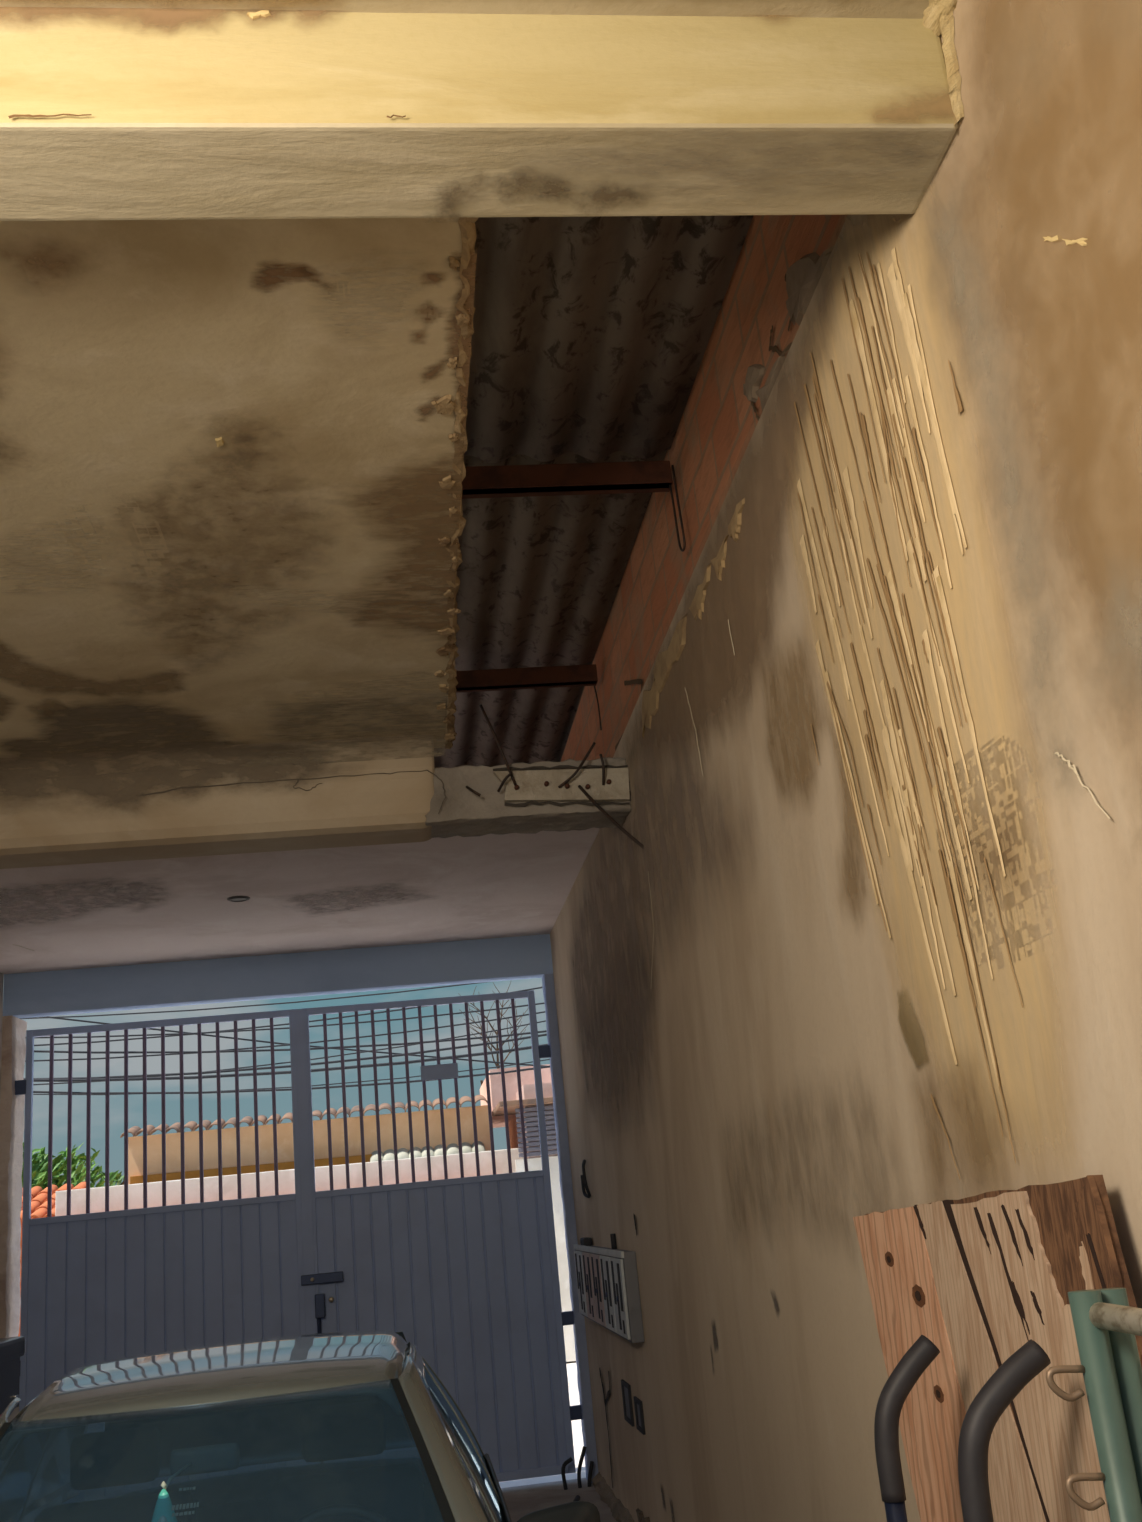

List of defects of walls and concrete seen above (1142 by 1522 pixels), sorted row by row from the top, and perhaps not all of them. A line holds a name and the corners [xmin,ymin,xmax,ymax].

peeling [246,10,271,20]
leakage [875,93,955,121]
leakage [589,186,638,204]
leakage [964,0,1142,678]
leakage [356,461,463,639]
spalling [414,217,479,749]
leakage [0,644,327,805]
spalling [493,765,631,807]
leakage [572,197,1060,1179]